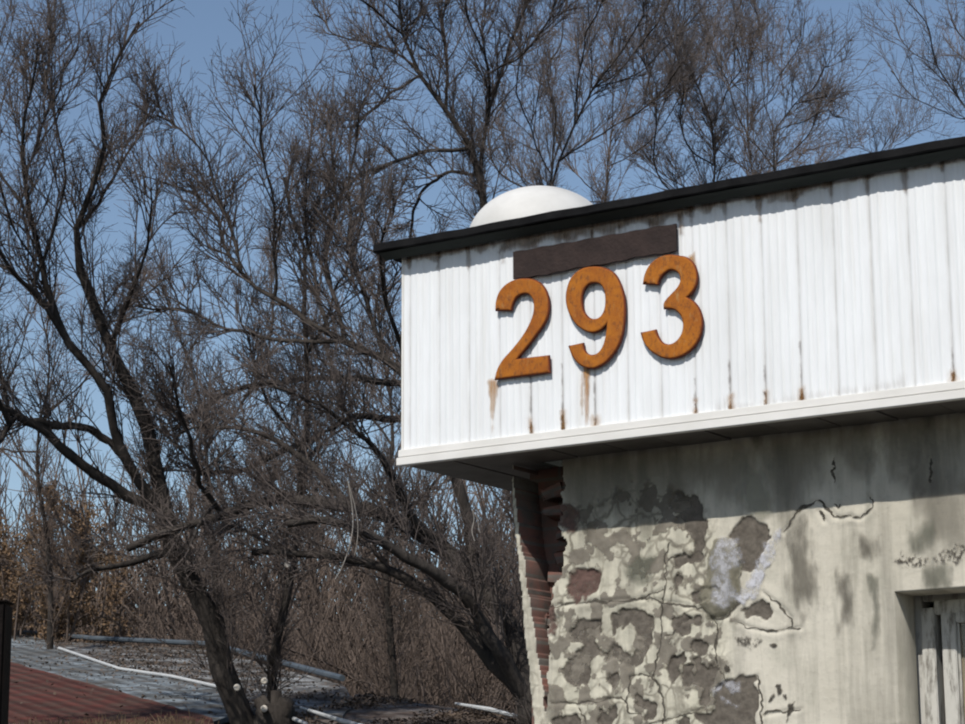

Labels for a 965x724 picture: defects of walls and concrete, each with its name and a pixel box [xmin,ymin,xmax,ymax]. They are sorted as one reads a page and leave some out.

crack [784,460,874,532]
peeling [540,481,794,724]
damp [711,530,780,606]
damp [791,529,813,601]
peeling [897,545,965,567]